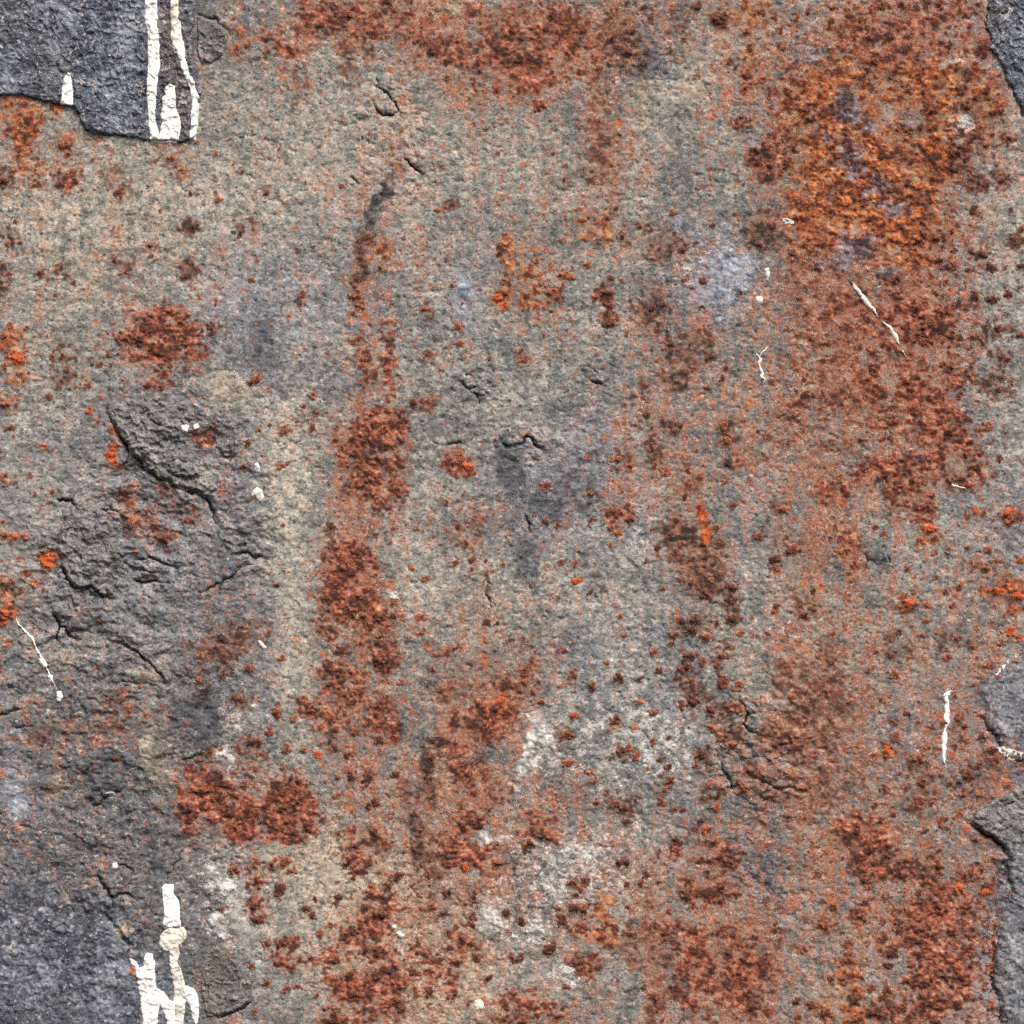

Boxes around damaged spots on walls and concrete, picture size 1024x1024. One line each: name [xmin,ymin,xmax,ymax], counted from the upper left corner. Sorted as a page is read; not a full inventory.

peeling [0,0,229,144]
rust [228,0,699,261]
crack [51,611,80,648]
crack [56,554,179,600]
rust [45,294,227,468]
crack [115,642,166,686]
peeling [111,401,241,498]
crack [106,408,263,593]
rust [176,445,1010,1024]
rust [663,0,1024,645]
peeling [0,844,255,1024]
peeling [972,789,1024,1024]